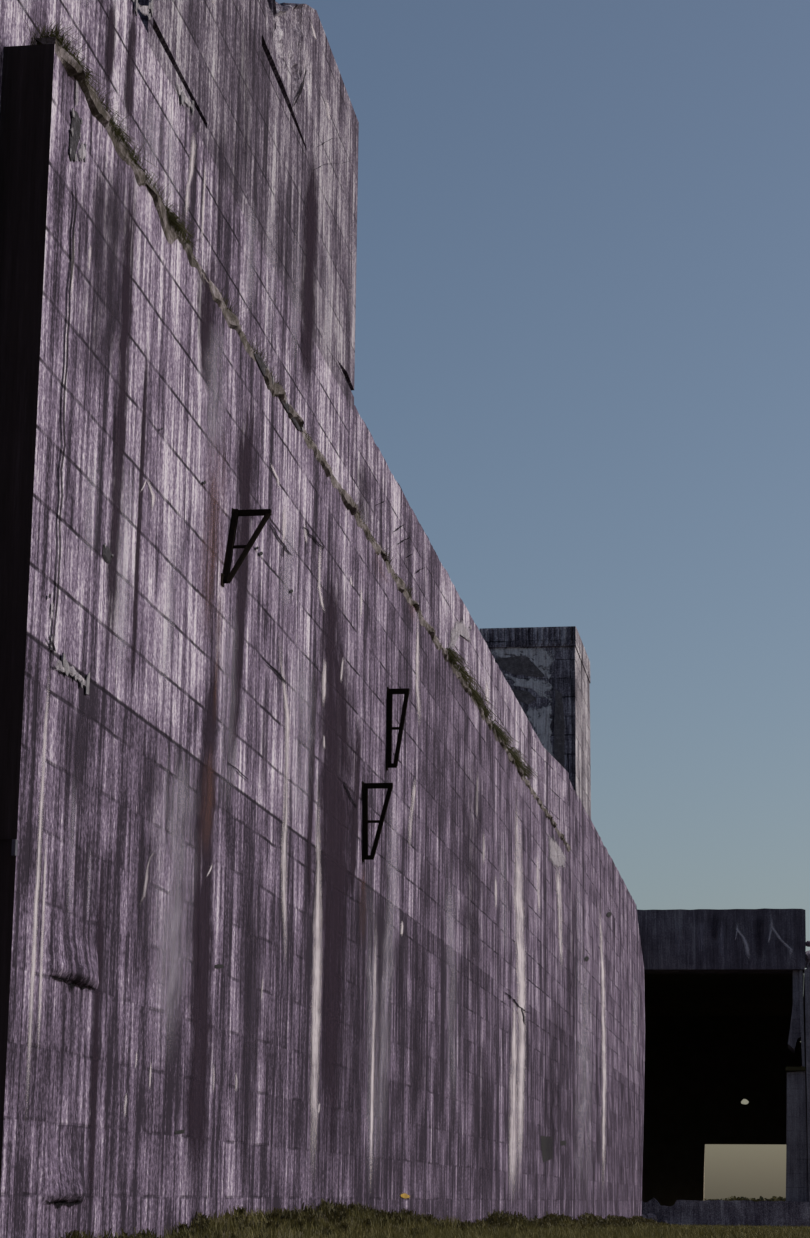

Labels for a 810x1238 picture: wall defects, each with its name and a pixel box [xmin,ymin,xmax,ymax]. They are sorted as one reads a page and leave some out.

leakage [106,5,137,116]
leakage [89,181,155,669]
spalling [133,0,154,20]
leakage [198,264,217,398]
leakage [186,34,251,248]
leakage [295,167,318,378]
efflorescence [29,709,47,1045]
leakage [89,893,104,1192]
leakage [187,409,254,1162]
leakage [302,557,384,1144]
leakage [510,824,525,1173]
spalling [491,647,565,768]